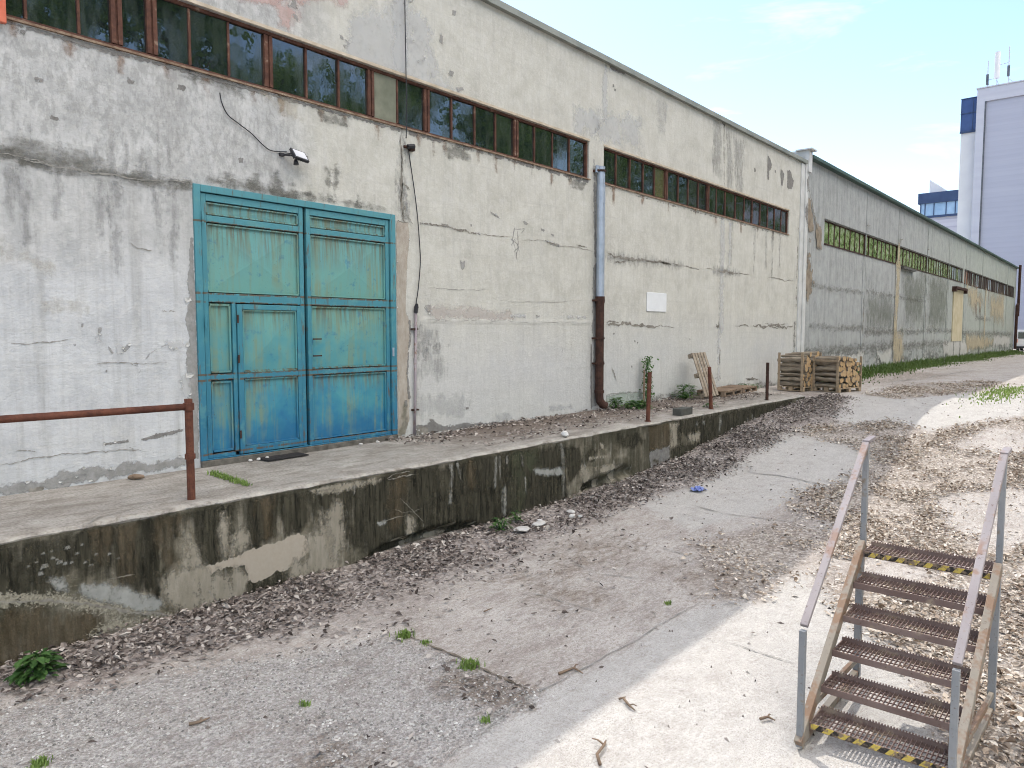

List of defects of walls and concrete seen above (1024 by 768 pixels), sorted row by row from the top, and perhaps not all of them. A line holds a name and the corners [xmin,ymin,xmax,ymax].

crack [398,128,791,282]
spalling [754,156,794,189]
spalling [567,161,646,409]
damp [793,244,1008,364]
damp [0,606,104,666]
damp [0,505,234,600]
flaking render [0,477,380,640]
damp [247,571,292,593]
flaking render [398,516,444,546]
damp [248,443,598,553]